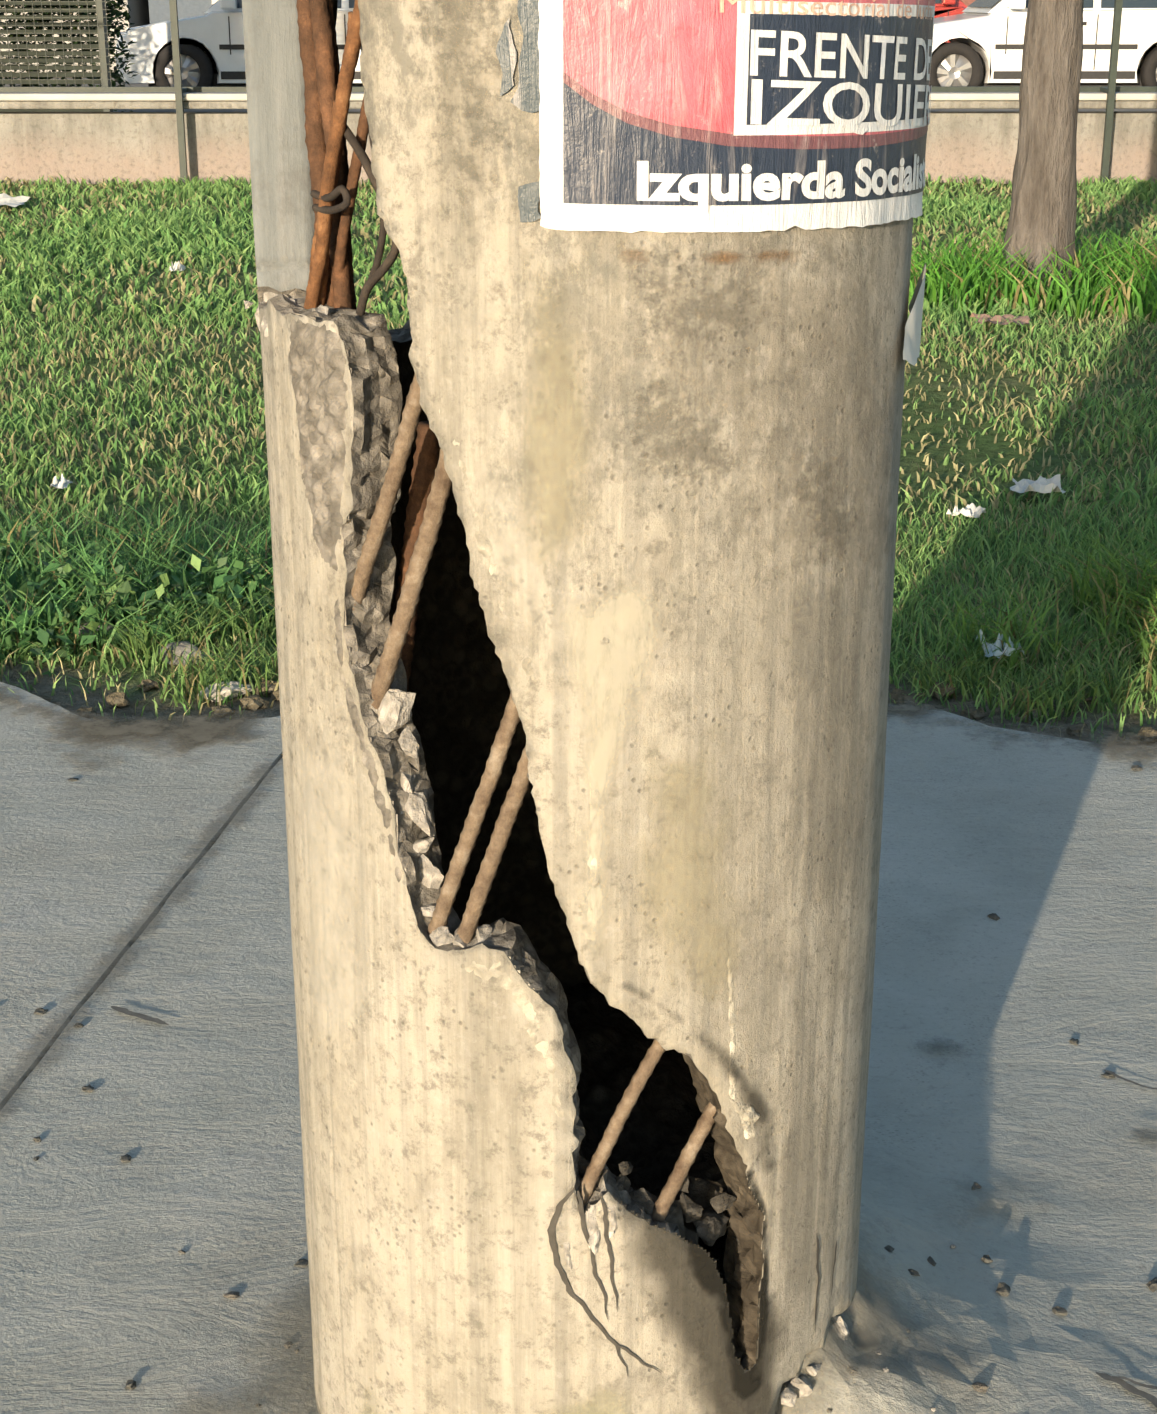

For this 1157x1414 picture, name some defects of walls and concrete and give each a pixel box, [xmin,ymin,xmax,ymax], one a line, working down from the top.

spalling [243,292,353,571]
spalling [334,598,564,1117]
peeling [571,592,653,941]
peeling [727,949,760,1139]
spalling [578,1154,590,1177]
crack [547,1187,661,1376]
spalling [585,1161,739,1256]